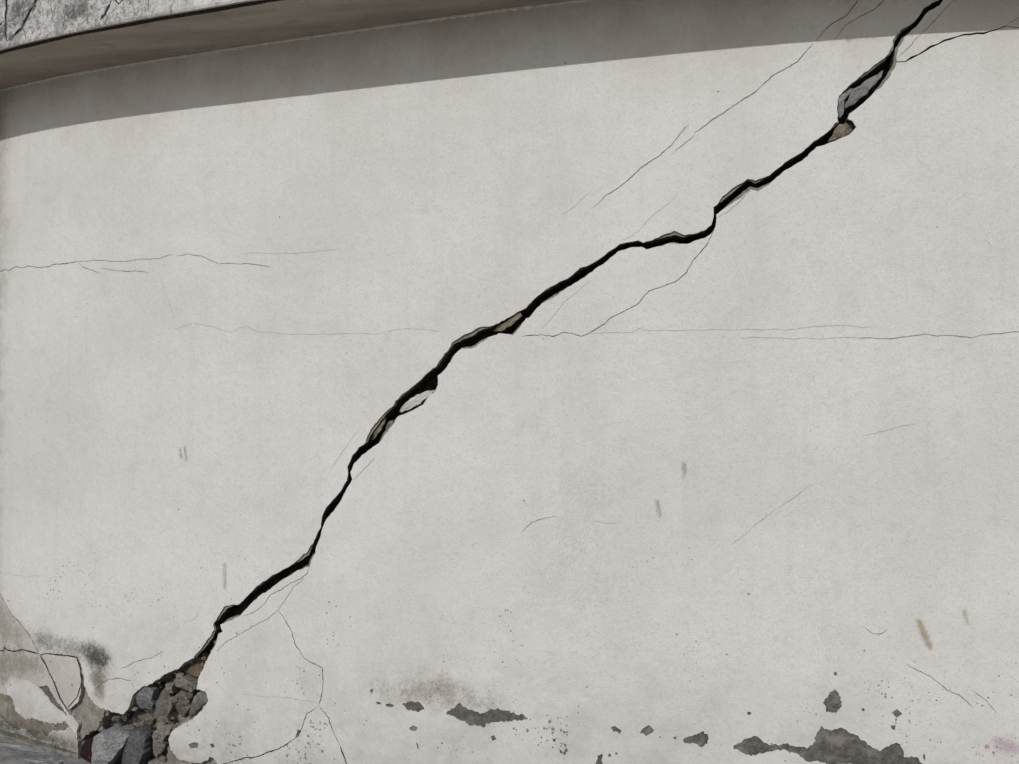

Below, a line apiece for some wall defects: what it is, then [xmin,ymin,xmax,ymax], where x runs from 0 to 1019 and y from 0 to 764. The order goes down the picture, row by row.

crack [0,0,66,41]
crack [0,249,337,332]
crack [194,0,1019,680]
spalling [0,654,210,759]
spalling [154,744,217,764]
crack [223,739,294,764]
crack [300,686,347,764]
peeling [447,703,528,741]
peeling [733,726,925,764]
peeling [823,689,842,713]